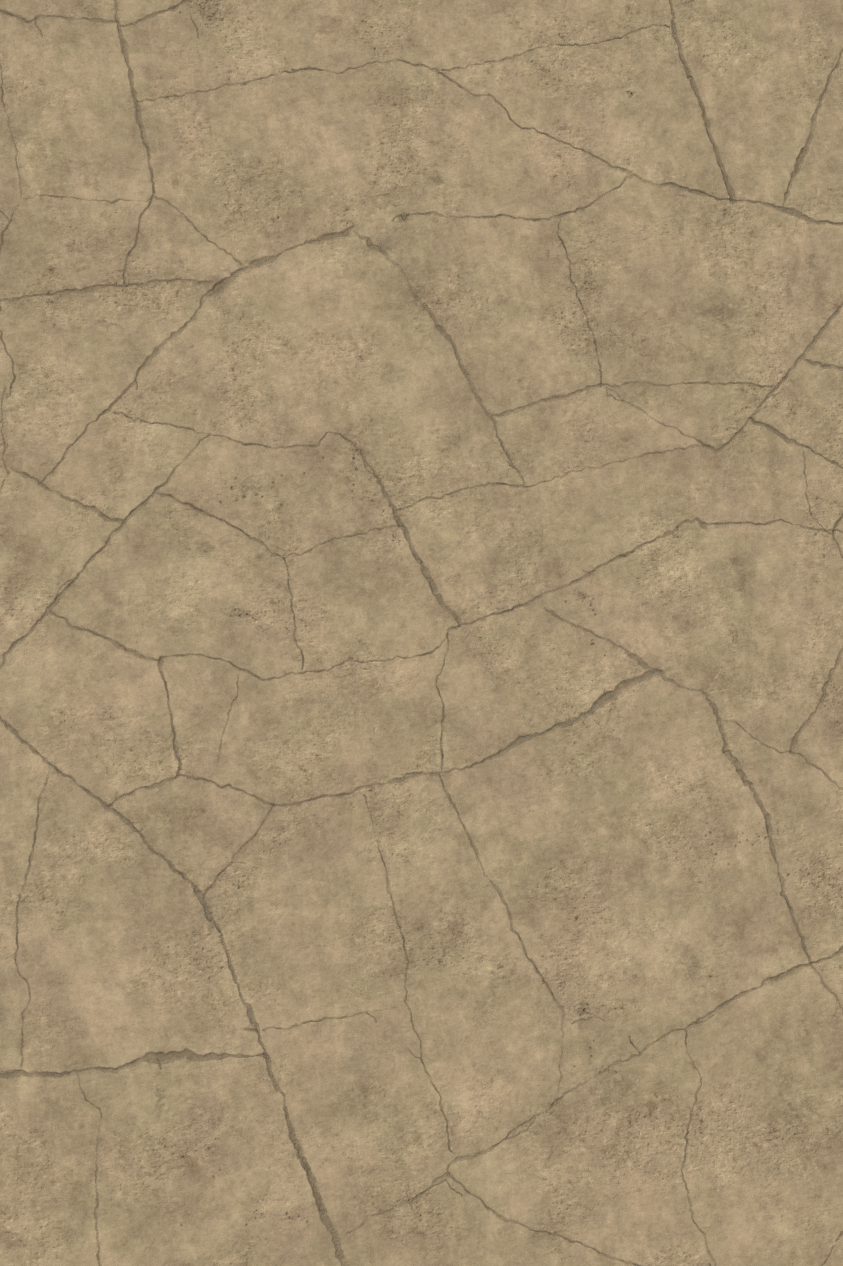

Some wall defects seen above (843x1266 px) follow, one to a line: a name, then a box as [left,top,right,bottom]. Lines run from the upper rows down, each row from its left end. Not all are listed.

crack [113,26,155,220]
crack [667,13,735,202]
crack [765,63,843,225]
crack [306,231,374,248]
crack [697,303,843,474]
crack [11,485,239,648]
crack [0,719,133,808]
crack [134,650,182,777]
crack [380,483,672,826]
crack [710,705,841,966]
crack [0,1067,108,1079]
crack [144,869,332,1231]